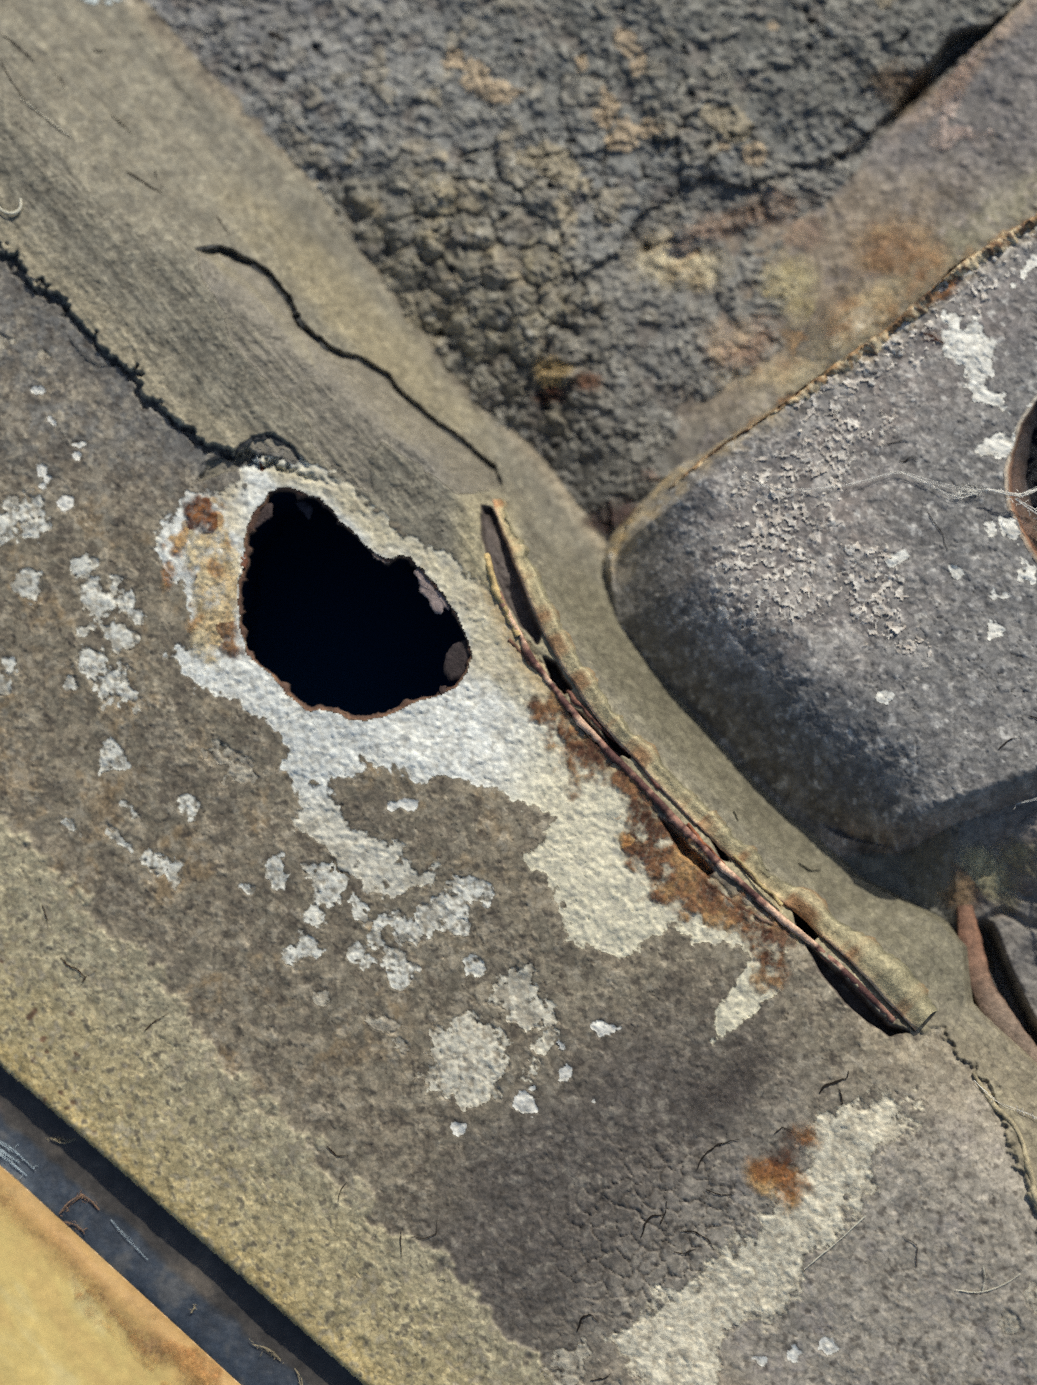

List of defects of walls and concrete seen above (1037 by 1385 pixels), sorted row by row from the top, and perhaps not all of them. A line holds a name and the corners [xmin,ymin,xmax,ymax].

crack [127,170,162,192]
crack [0,248,121,366]
crack [196,216,495,471]
rust [162,495,240,662]
spalling [240,493,470,716]
rust [527,692,796,993]
rust [748,1130,816,1208]